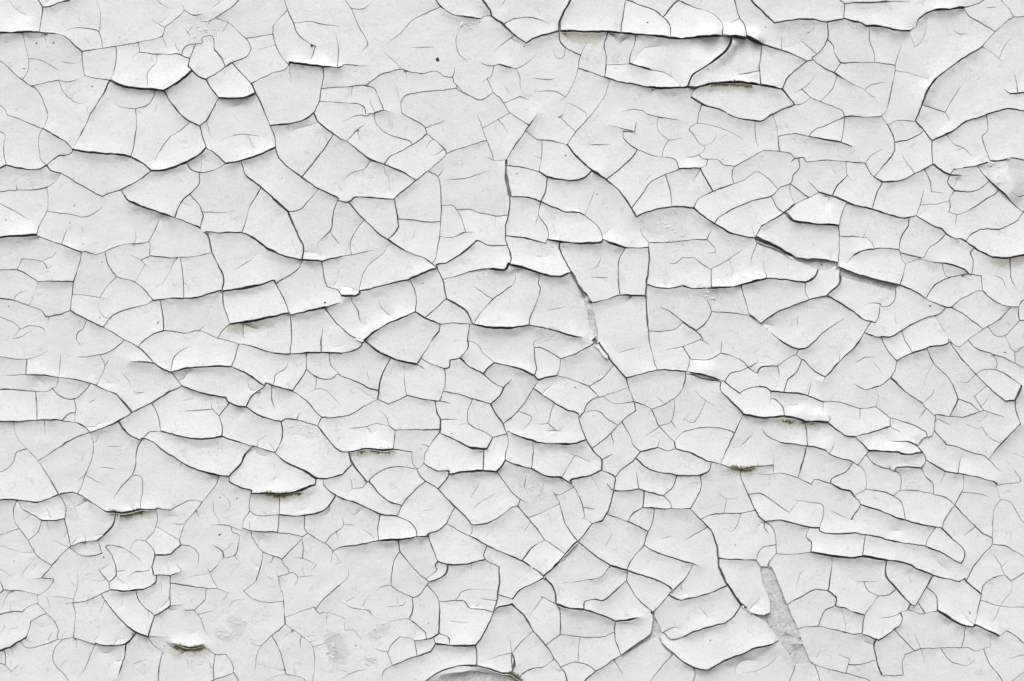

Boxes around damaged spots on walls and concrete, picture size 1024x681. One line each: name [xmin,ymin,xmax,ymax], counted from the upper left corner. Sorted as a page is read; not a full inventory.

crack [412,0,486,21]
crack [0,61,81,113]
crack [964,157,1024,168]
crack [0,207,100,301]
crack [129,252,193,288]
peeling [721,382,1024,642]
crack [0,623,31,671]
crack [71,527,228,677]
crack [174,643,239,681]
crack [244,570,349,681]
peeling [73,472,815,681]
crack [650,627,771,681]